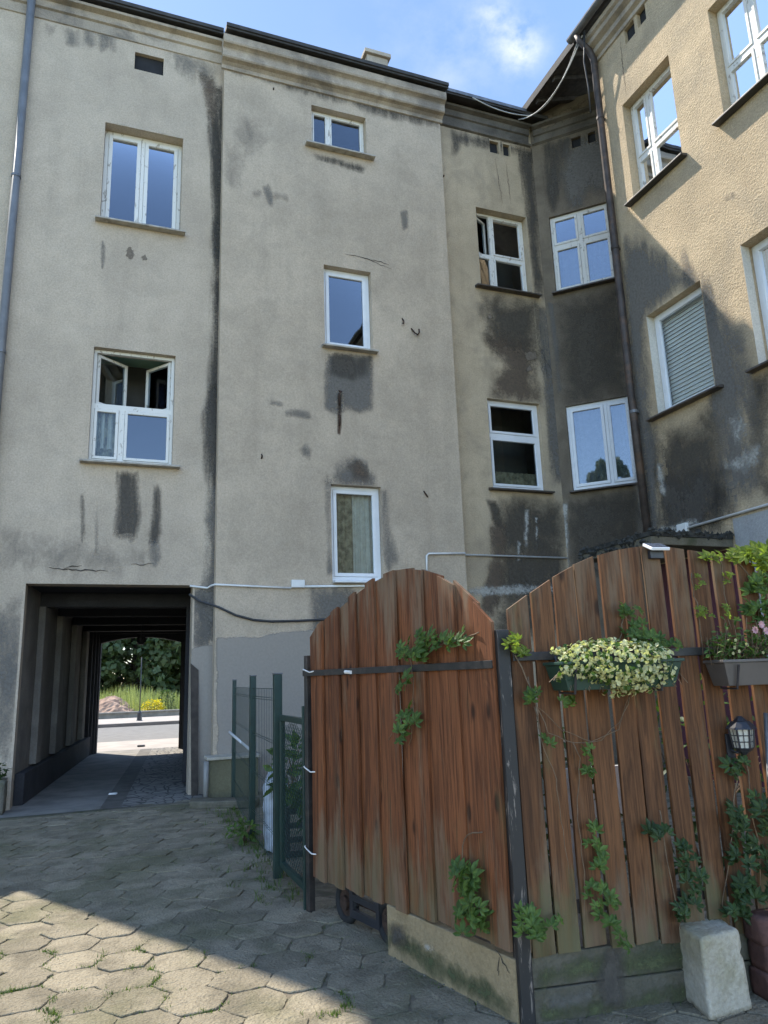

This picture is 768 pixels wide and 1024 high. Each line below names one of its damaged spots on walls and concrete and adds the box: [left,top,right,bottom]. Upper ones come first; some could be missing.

damp [179,58,222,645]
damp [325,354,372,414]
damp [469,240,768,633]
damp [335,459,372,485]
damp [116,473,139,540]
damp [150,489,160,562]
crack [49,564,105,572]